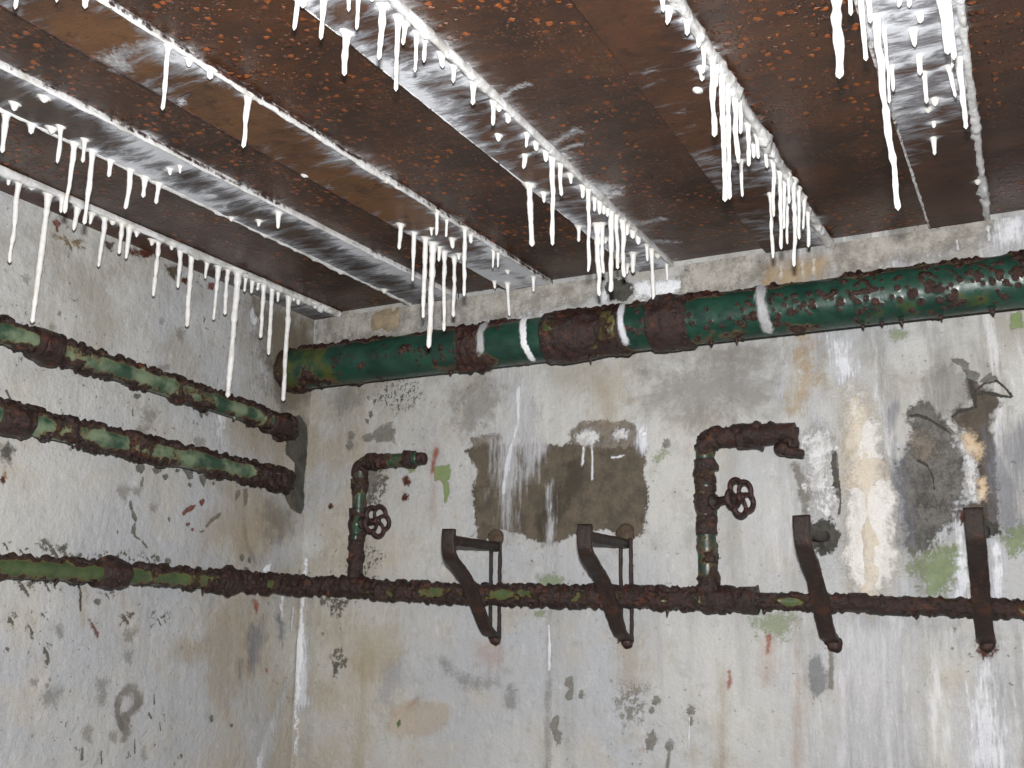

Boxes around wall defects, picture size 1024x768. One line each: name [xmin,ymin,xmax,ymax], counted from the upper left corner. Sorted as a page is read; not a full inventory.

leakage [0,0,594,317]
leakage [387,0,684,346]
leakage [665,0,834,248]
leakage [866,27,878,75]
leakage [886,91,931,229]
leakage [954,0,1024,254]
leakage [253,297,314,368]
leakage [274,381,307,411]
leakage [495,367,546,528]
leakage [544,487,553,575]
spalling [893,401,969,556]
flaking render [951,358,997,383]